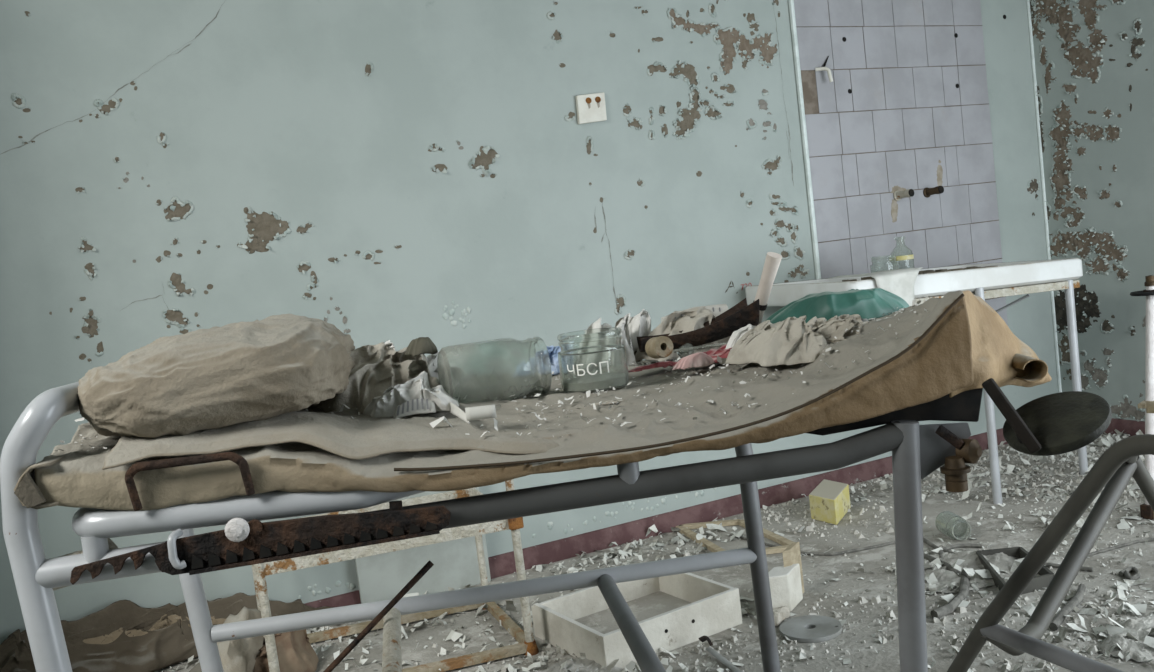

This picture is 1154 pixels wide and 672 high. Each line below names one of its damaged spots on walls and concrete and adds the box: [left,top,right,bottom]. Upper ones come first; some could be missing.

crack [1,3,224,154]
peeling [623,0,778,140]
peeling [79,98,123,122]
peeling [428,140,500,178]
peeling [1027,0,1148,282]
peeling [156,237,183,263]
peeling [156,196,194,222]
peeling [237,206,314,254]
peeling [760,193,809,282]
peeling [70,297,104,363]
peeling [163,272,213,334]